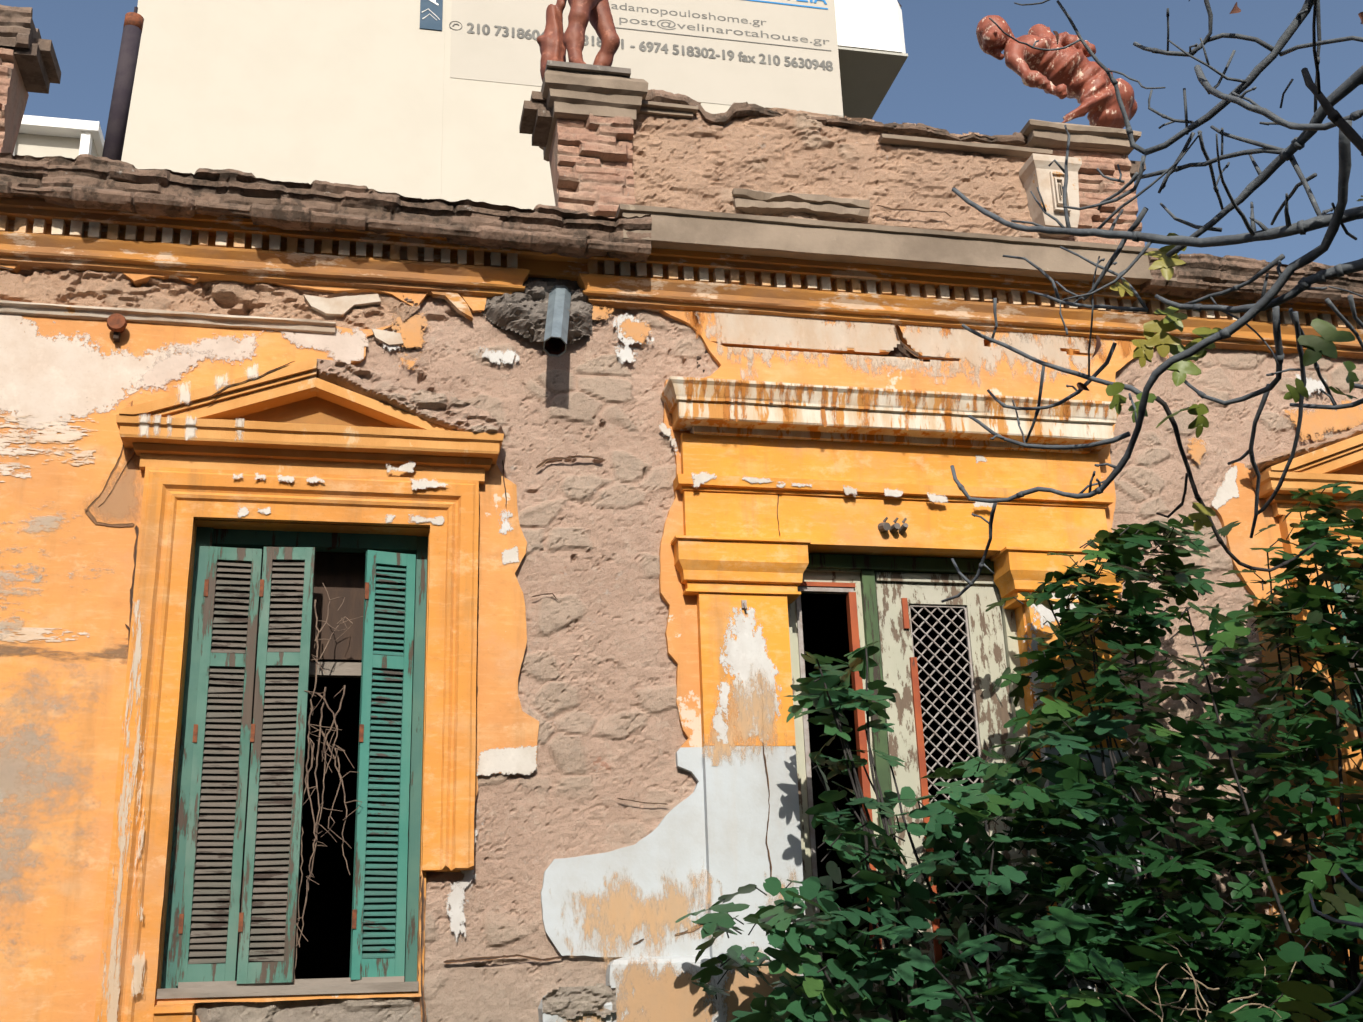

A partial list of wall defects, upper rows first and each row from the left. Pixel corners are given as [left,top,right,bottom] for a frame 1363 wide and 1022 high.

spalling [0,269,1114,1022]
crack [894,326,960,360]
spalling [1088,348,1363,998]